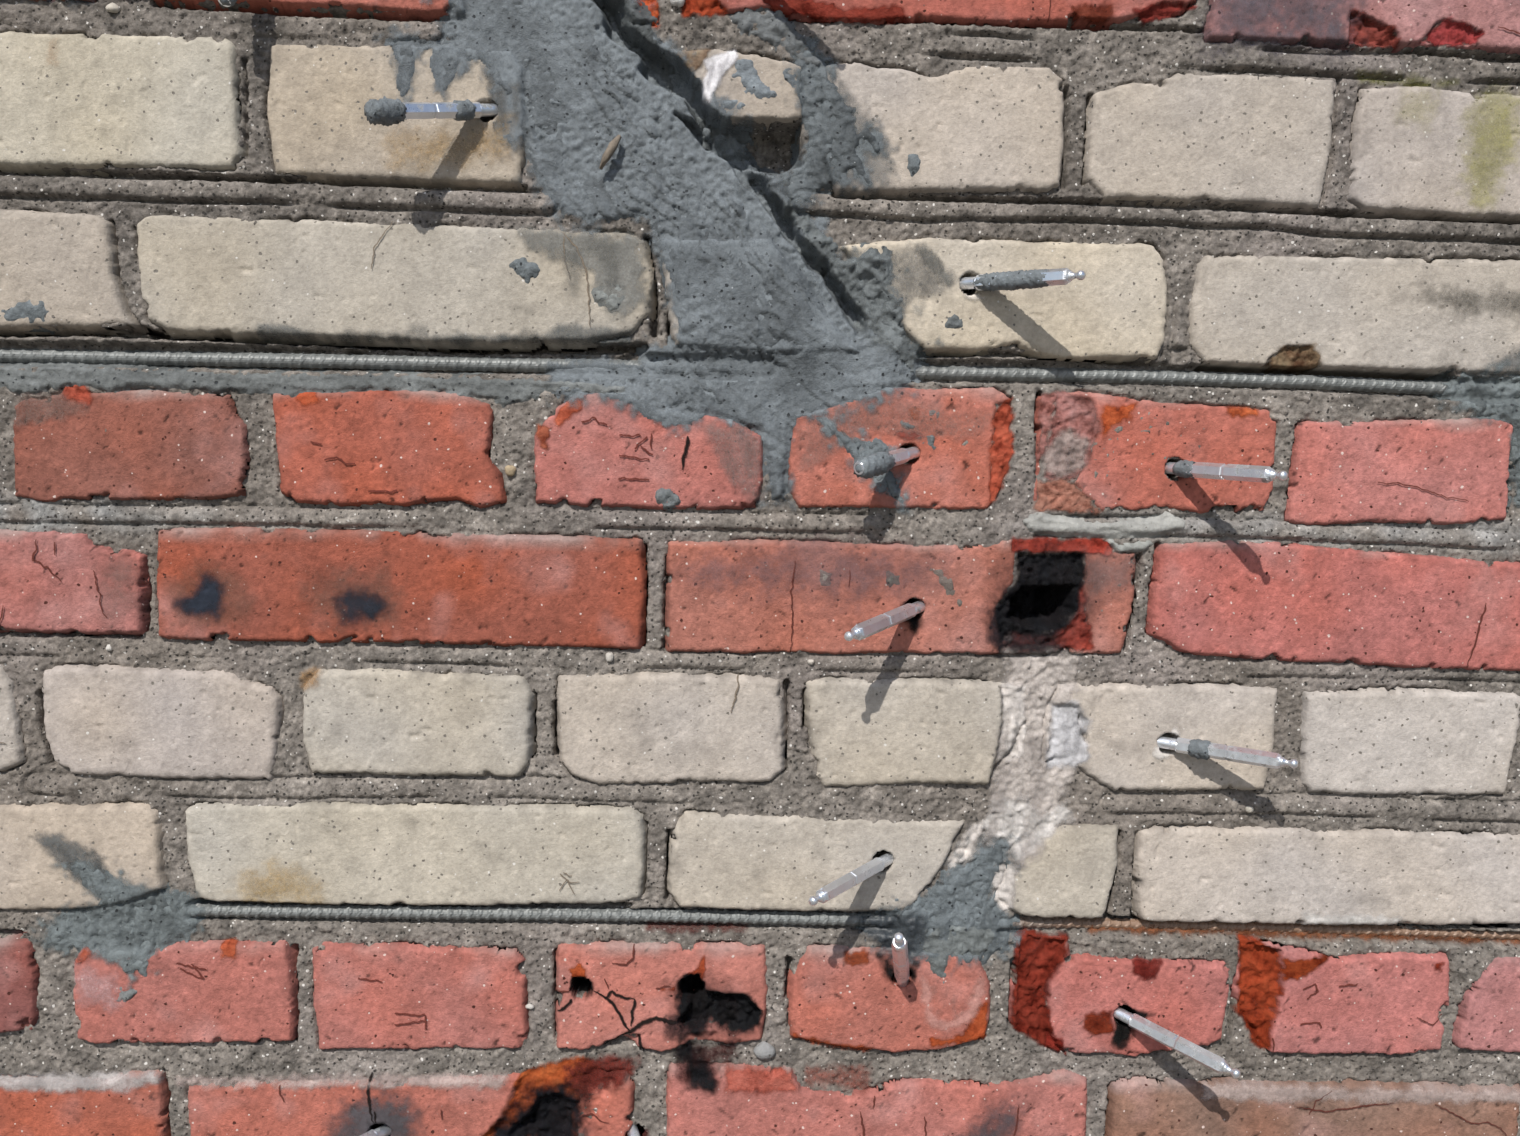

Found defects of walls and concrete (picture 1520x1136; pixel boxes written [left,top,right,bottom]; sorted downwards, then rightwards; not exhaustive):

crack [371,221,393,269]
crack [563,232,591,327]
crack [32,539,107,618]
spalling [1011,537,1112,556]
damp [947,650,1089,910]
crack [557,944,681,1052]
spalling [1011,928,1069,1051]
spalling [1084,1011,1114,1035]
spalling [1133,957,1162,980]
spalling [1235,933,1329,1049]
corrosion [1089,925,1520,944]
corrosion [564,1055,635,1100]